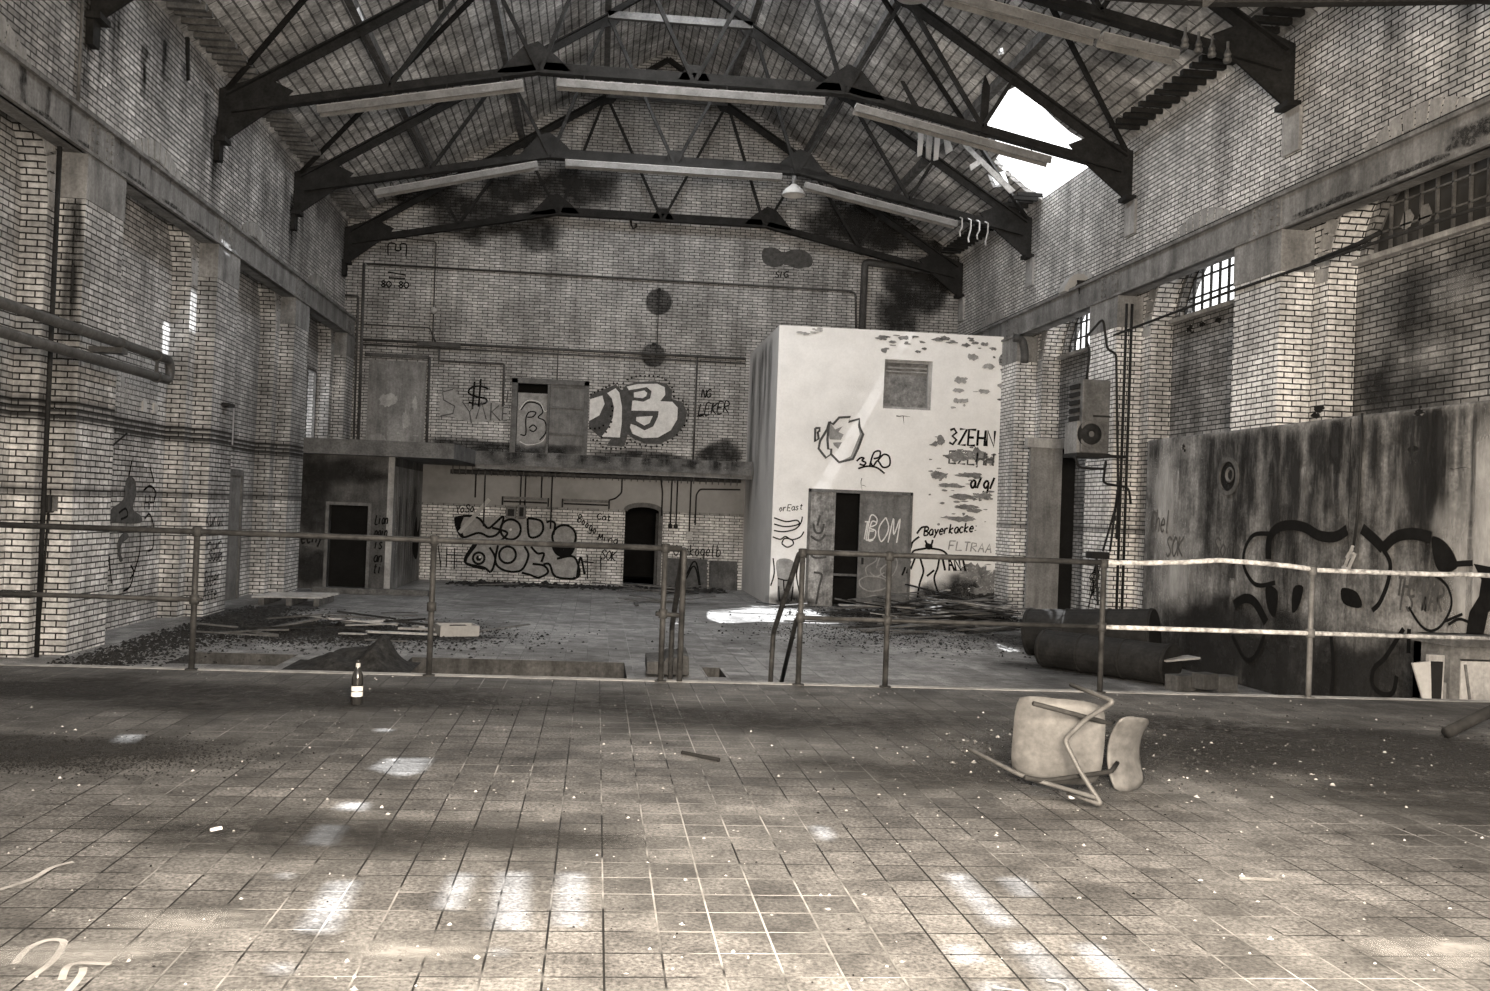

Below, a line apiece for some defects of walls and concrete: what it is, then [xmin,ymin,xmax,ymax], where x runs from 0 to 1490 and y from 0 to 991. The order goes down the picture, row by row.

peeling [875,335,1002,409]
peeling [929,435,999,526]
leakage [1150,410,1490,698]